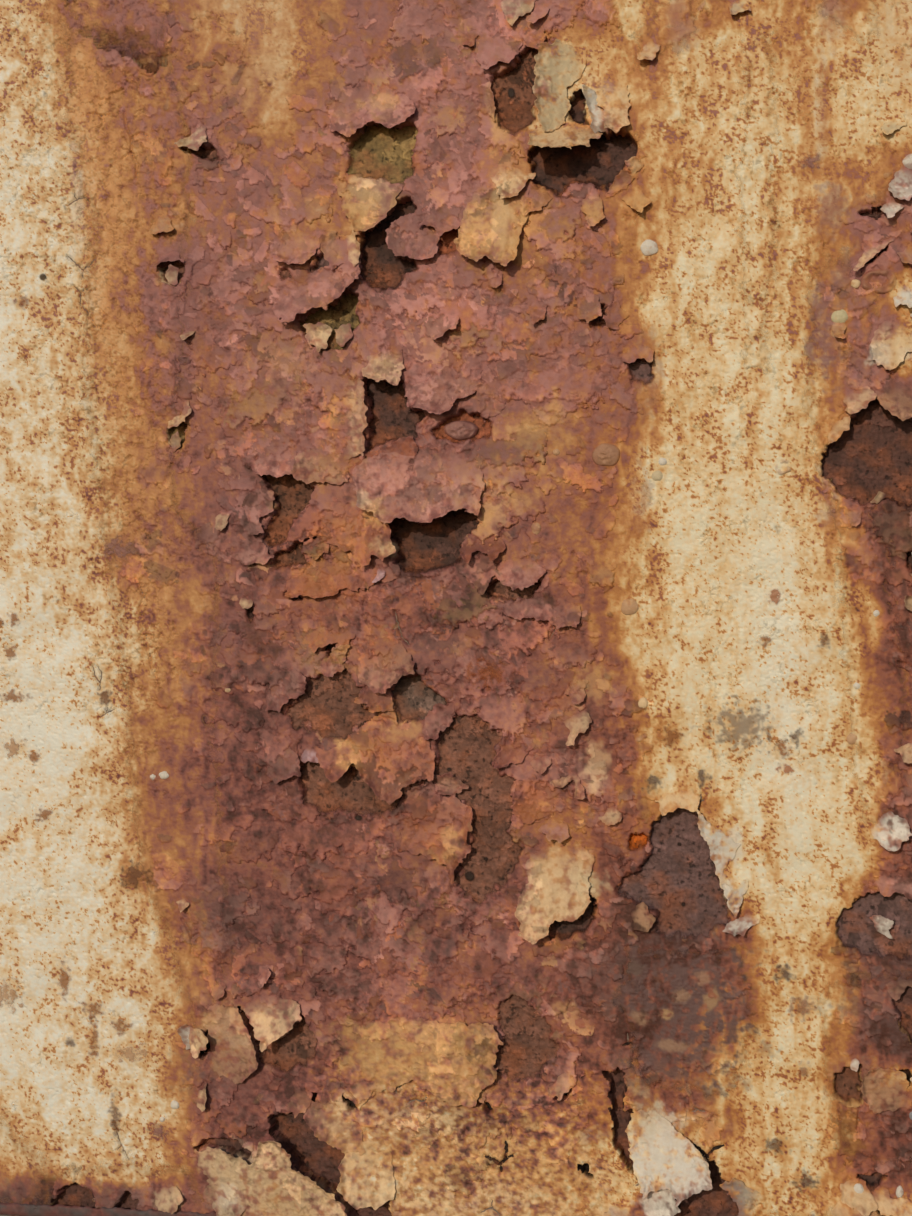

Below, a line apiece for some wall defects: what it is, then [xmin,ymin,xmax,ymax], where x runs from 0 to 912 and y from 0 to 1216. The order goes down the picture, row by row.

peeling [500,0,549,26]
rust [270,21,651,352]
rust [860,198,904,220]
peeling [888,163,912,201]
peeling [870,282,912,370]
peeling [459,532,506,595]
rust [802,237,912,822]
rust [0,0,597,1216]
peeling [870,811,912,851]
rust [602,770,779,1216]
rust [790,874,912,1216]
peeling [155,1185,184,1214]